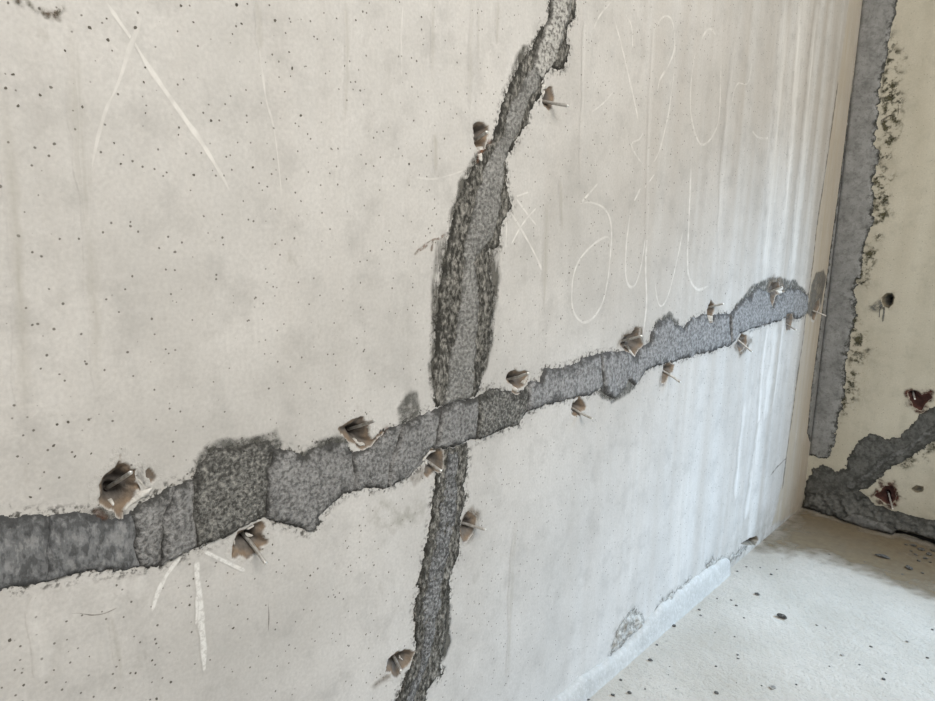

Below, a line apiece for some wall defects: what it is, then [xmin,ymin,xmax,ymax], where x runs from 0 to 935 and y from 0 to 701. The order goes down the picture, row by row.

crack [0,278,809,701]
crack [429,0,576,408]
damp [761,0,935,597]
crack [804,407,935,544]